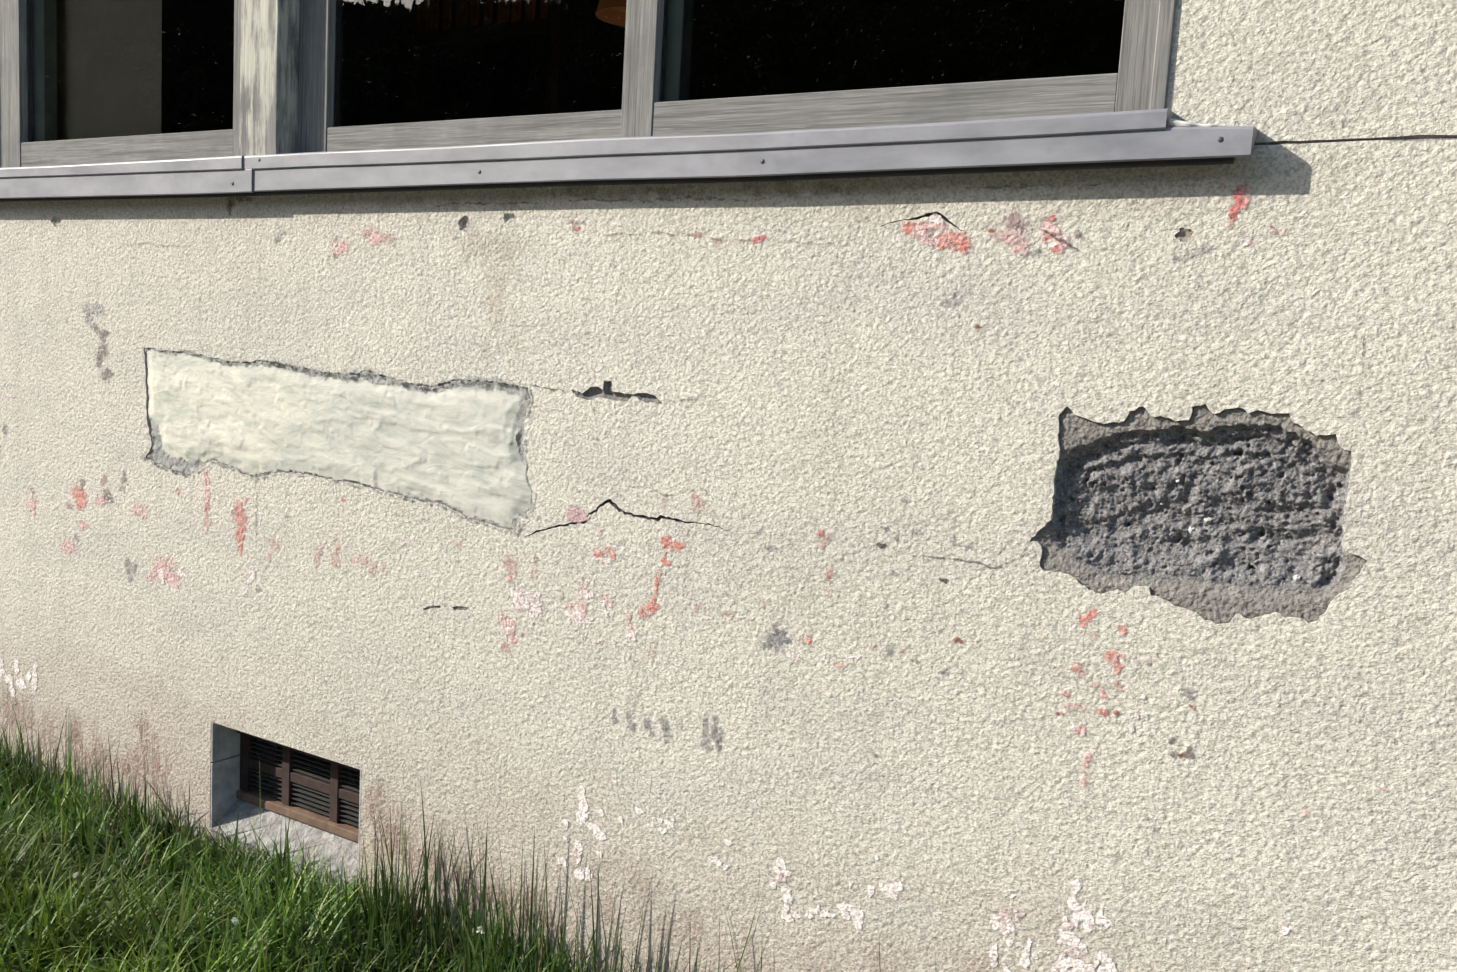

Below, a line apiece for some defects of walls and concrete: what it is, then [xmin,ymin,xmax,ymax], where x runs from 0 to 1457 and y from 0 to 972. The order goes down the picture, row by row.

peeling [880,212,971,254]
peeling [986,212,1082,257]
spalling [145,348,663,531]
peeling [566,505,615,564]
crack [510,499,728,537]
peeling [496,555,637,652]
spalling [911,404,1367,787]